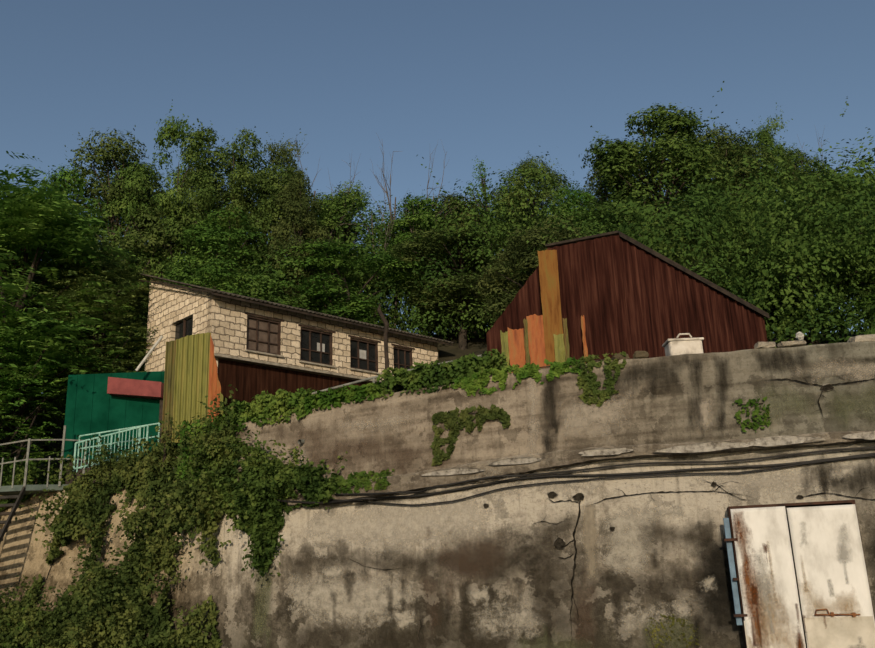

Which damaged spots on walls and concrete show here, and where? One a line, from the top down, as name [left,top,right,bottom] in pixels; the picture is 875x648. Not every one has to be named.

damp [609,363,677,387]
damp [692,399,708,426]
damp [716,361,727,425]
damp [759,353,805,370]
crack [772,378,873,416]
damp [295,526,566,623]
crack [534,481,764,645]
corrosion [735,514,806,648]